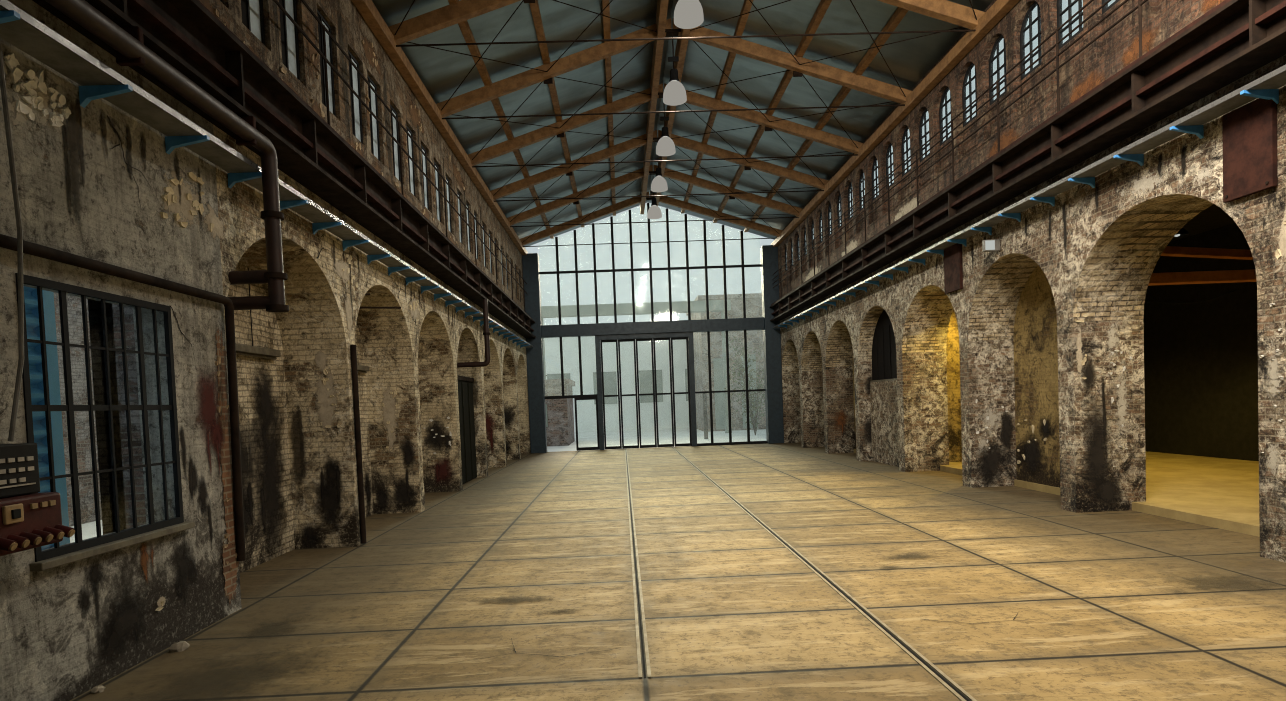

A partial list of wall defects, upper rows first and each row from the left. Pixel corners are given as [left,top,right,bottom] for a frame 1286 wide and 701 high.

peeling [3,53,71,137]
leakage [80,560,144,659]
leakage [175,545,197,604]